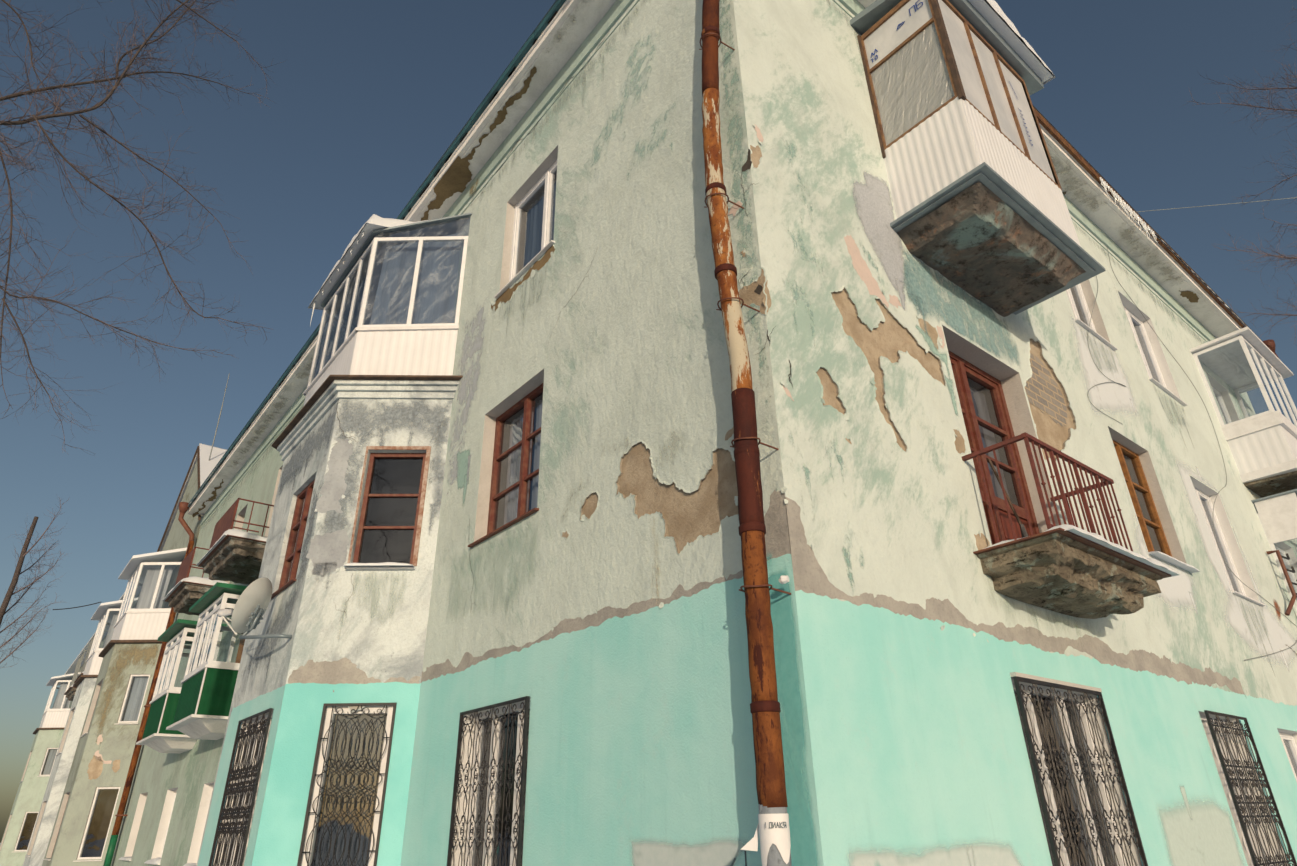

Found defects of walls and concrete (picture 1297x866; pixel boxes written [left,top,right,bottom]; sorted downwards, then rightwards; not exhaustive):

flaking render [420,65,537,221]
spalling [491,245,556,313]
spalling [739,267,771,316]
flaking render [829,172,966,454]
flaking render [814,366,852,469]
spalling [1023,337,1077,462]
flaking render [562,427,739,556]
peeling [287,570,743,692]
peeling [764,486,1246,696]